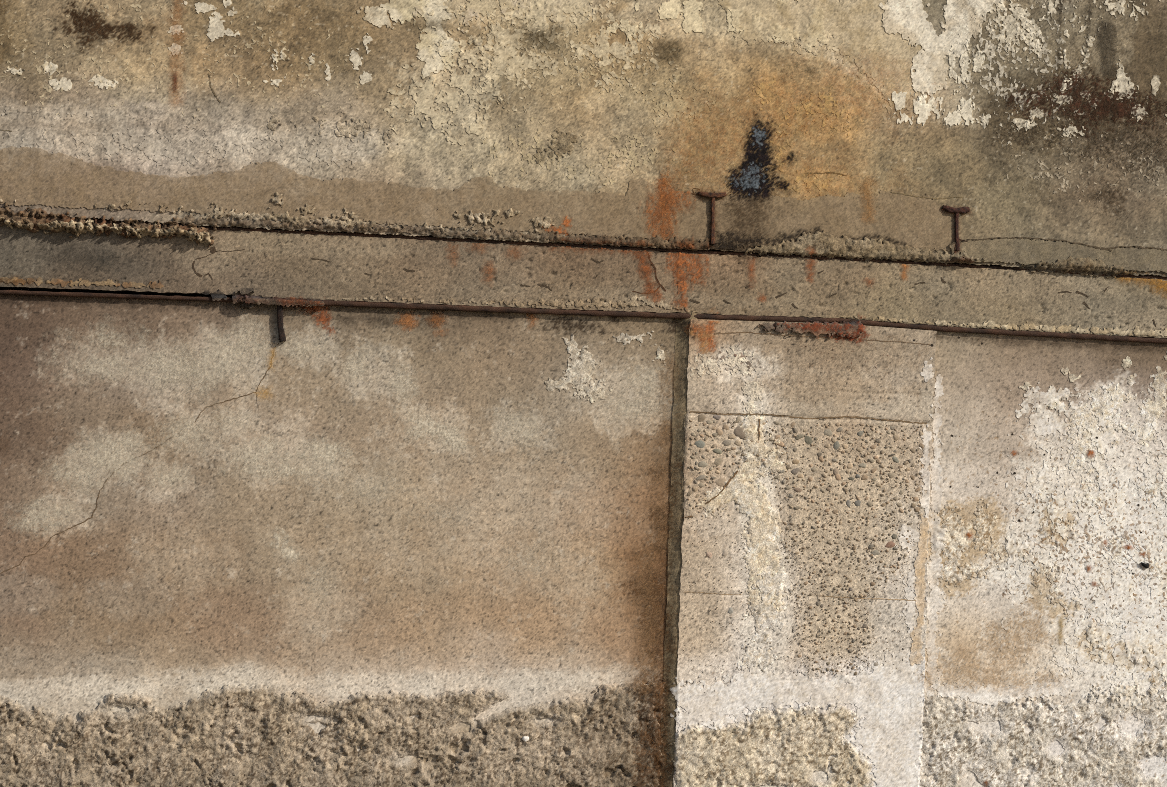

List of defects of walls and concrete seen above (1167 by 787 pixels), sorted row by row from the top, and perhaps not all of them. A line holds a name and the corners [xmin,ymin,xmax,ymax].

water stain [54,1,156,52]
peeling [0,0,1167,206]
rust [646,178,709,307]
water stain [82,330,260,392]
water stain [543,330,666,414]
rust [777,317,889,369]
spalling [840,315,1167,337]
crack [1,343,279,573]
water stain [234,437,352,476]
spalling [670,351,1167,787]
water stain [943,613,1063,688]